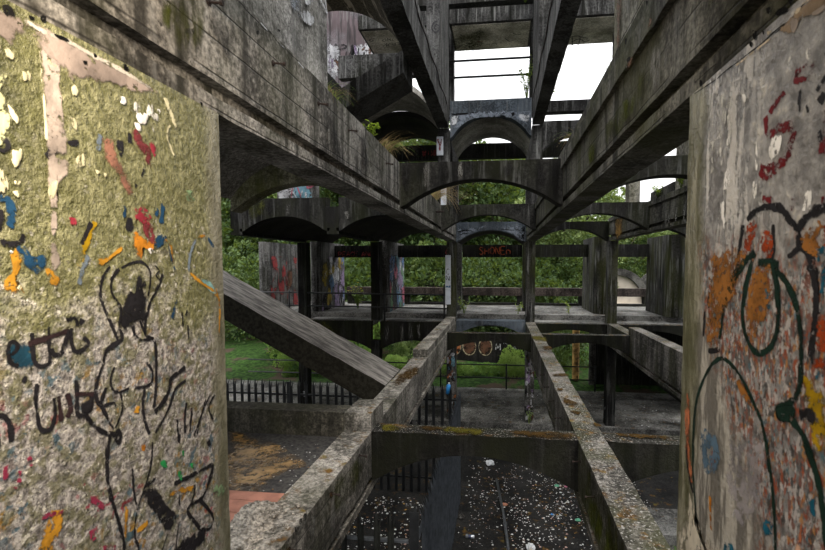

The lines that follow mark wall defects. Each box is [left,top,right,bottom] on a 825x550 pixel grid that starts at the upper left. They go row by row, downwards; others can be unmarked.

flaking render [0,4,177,270]
flaking render [749,0,825,47]